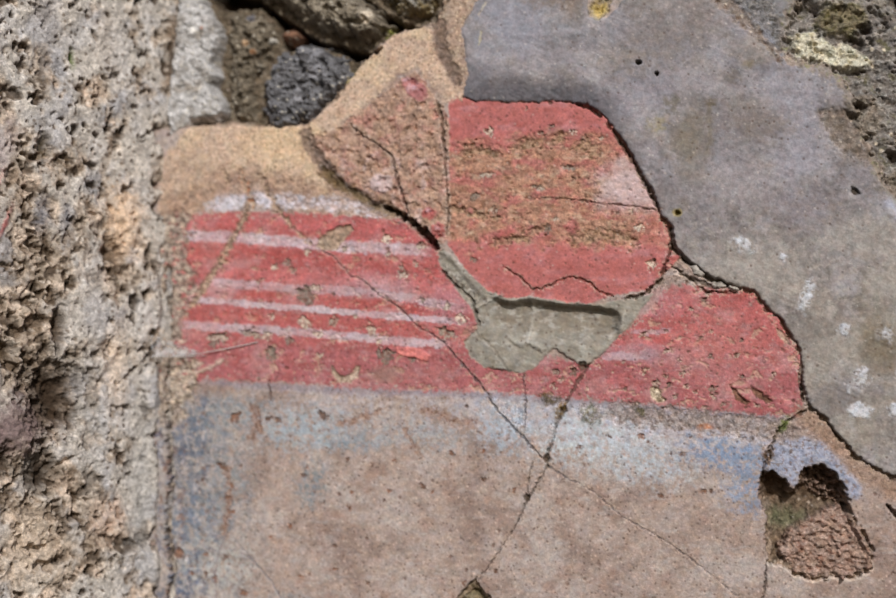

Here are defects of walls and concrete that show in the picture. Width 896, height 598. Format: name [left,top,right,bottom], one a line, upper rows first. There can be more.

spalling [432,18,462,86]
spalling [712,0,896,196]
crack [351,96,481,328]
crack [524,197,662,214]
flaking render [159,70,665,426]
crack [502,243,713,301]
leakage [856,314,896,372]
crack [349,275,741,598]
flaking render [603,348,896,501]
crack [790,405,809,423]
leakage [804,374,867,418]
crack [846,444,896,482]